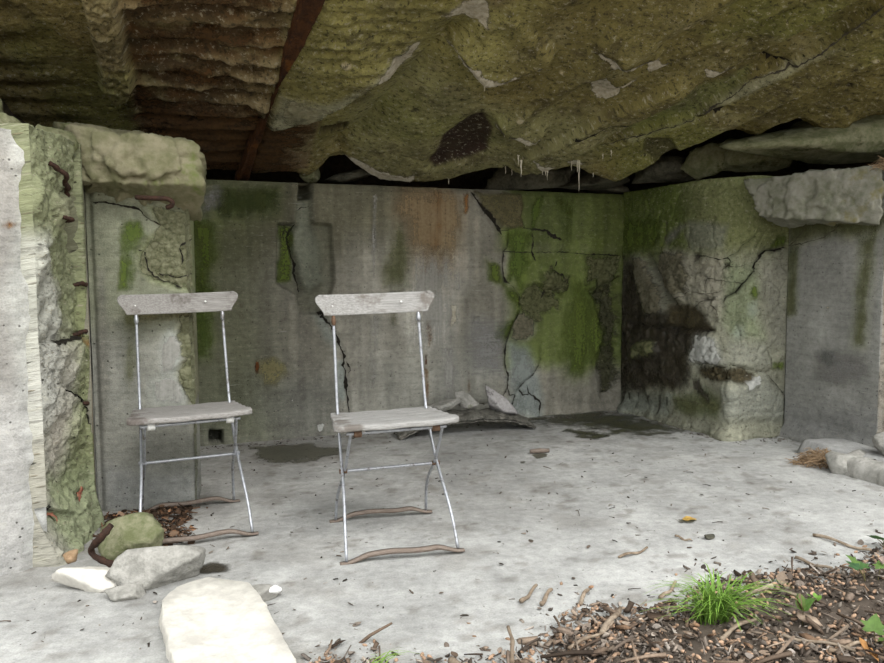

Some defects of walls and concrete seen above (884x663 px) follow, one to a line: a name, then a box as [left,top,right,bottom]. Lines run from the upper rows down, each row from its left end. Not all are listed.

leakage [346,155,415,182]
efflorescence [496,125,540,174]
crack [138,238,192,288]
crack [316,311,351,409]
crack [471,192,618,415]
leakage [621,256,721,413]
crack [622,222,842,332]